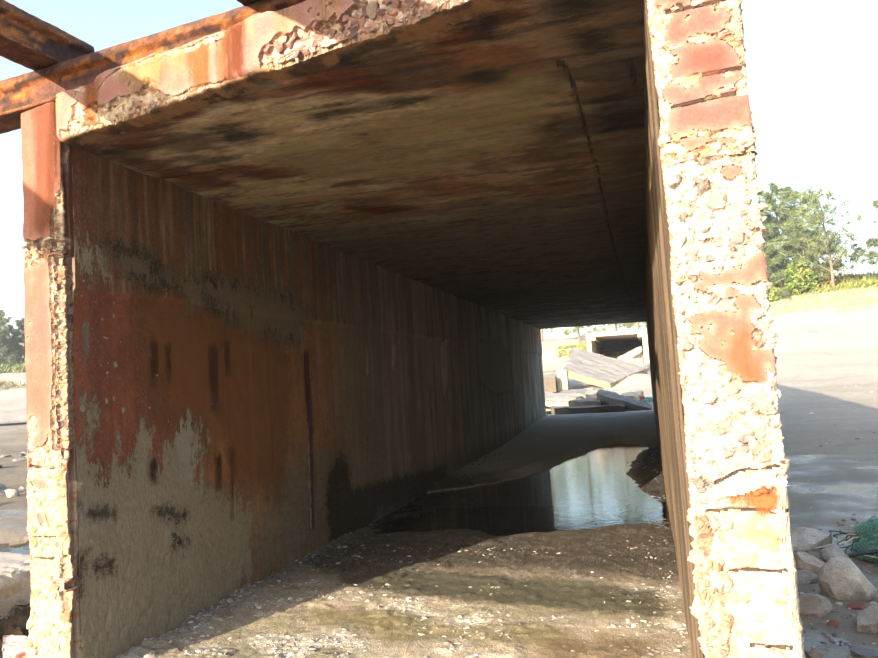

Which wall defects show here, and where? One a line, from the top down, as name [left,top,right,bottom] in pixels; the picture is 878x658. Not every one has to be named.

corrosion [179,23,242,85]
spalling [259,0,467,68]
corrosion [84,84,98,126]
crack [556,59,635,310]
spalling [647,0,805,658]
peeling [22,79,264,658]
corrosion [303,350,315,530]
leakage [324,448,447,544]
crack [707,506,789,514]
crack [714,460,786,484]
crack [729,565,794,573]
crack [750,643,799,651]